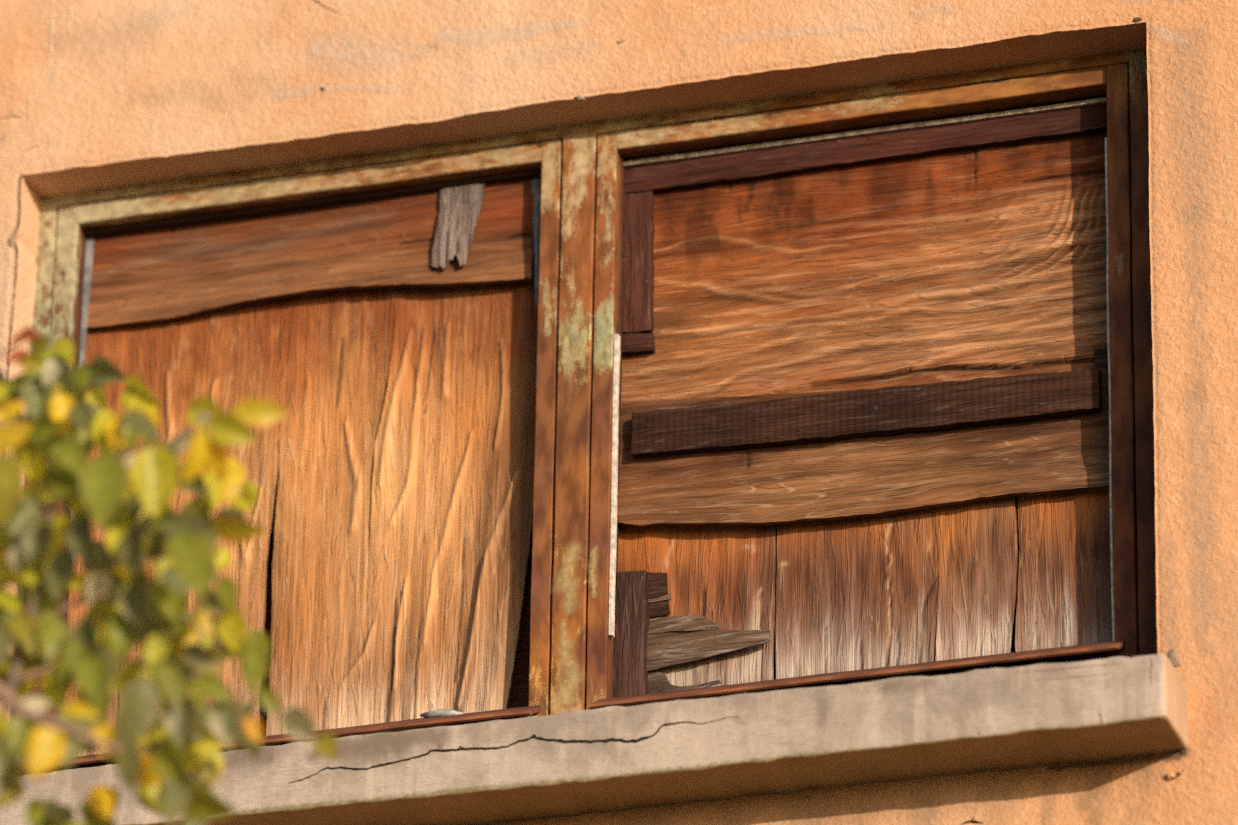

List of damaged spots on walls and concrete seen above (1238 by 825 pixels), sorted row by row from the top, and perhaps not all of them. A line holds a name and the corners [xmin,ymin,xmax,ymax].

crack [289,716,736,783]